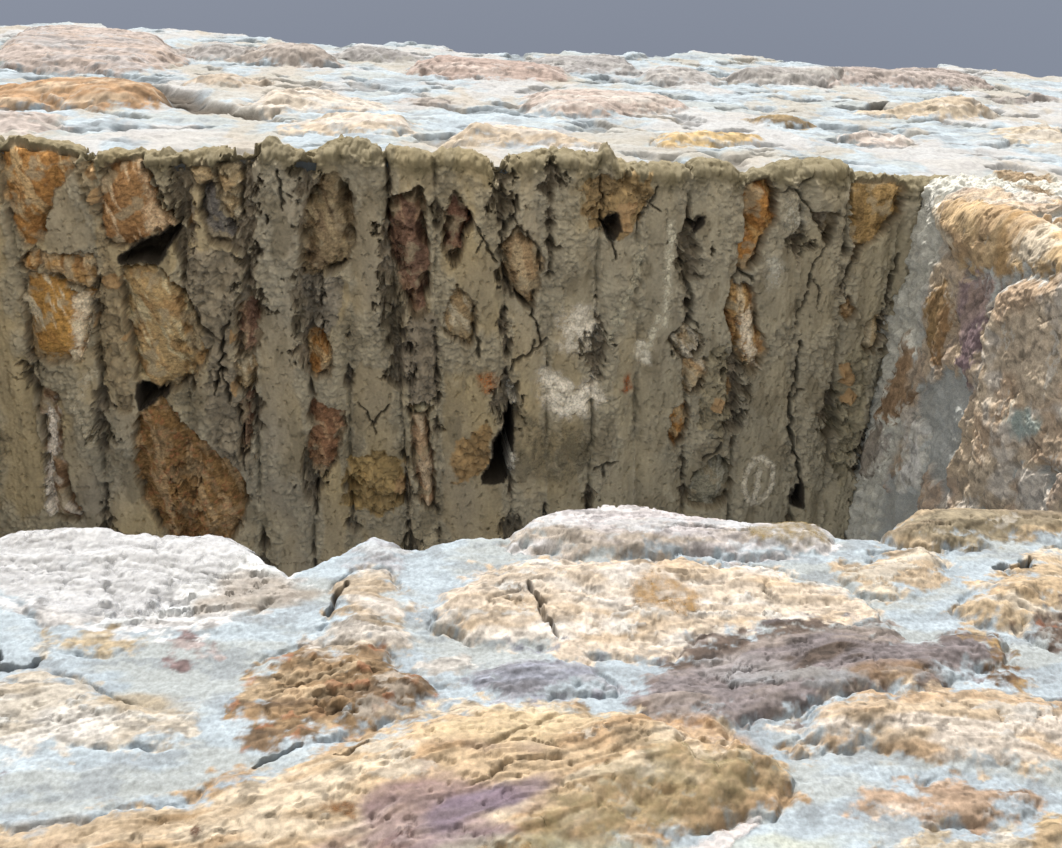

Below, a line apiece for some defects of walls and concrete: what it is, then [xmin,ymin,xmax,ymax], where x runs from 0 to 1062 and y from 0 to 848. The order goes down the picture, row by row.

spalling [0,135,264,540]
spalling [296,171,358,383]
crack [357,402,390,436]
spalling [303,184,496,519]
crack [470,321,482,360]
crack [474,193,548,375]
crack [664,254,700,343]
spalling [666,175,783,513]
crack [730,267,756,283]
crack [769,177,813,215]
crack [785,245,855,490]
spalling [811,173,909,264]